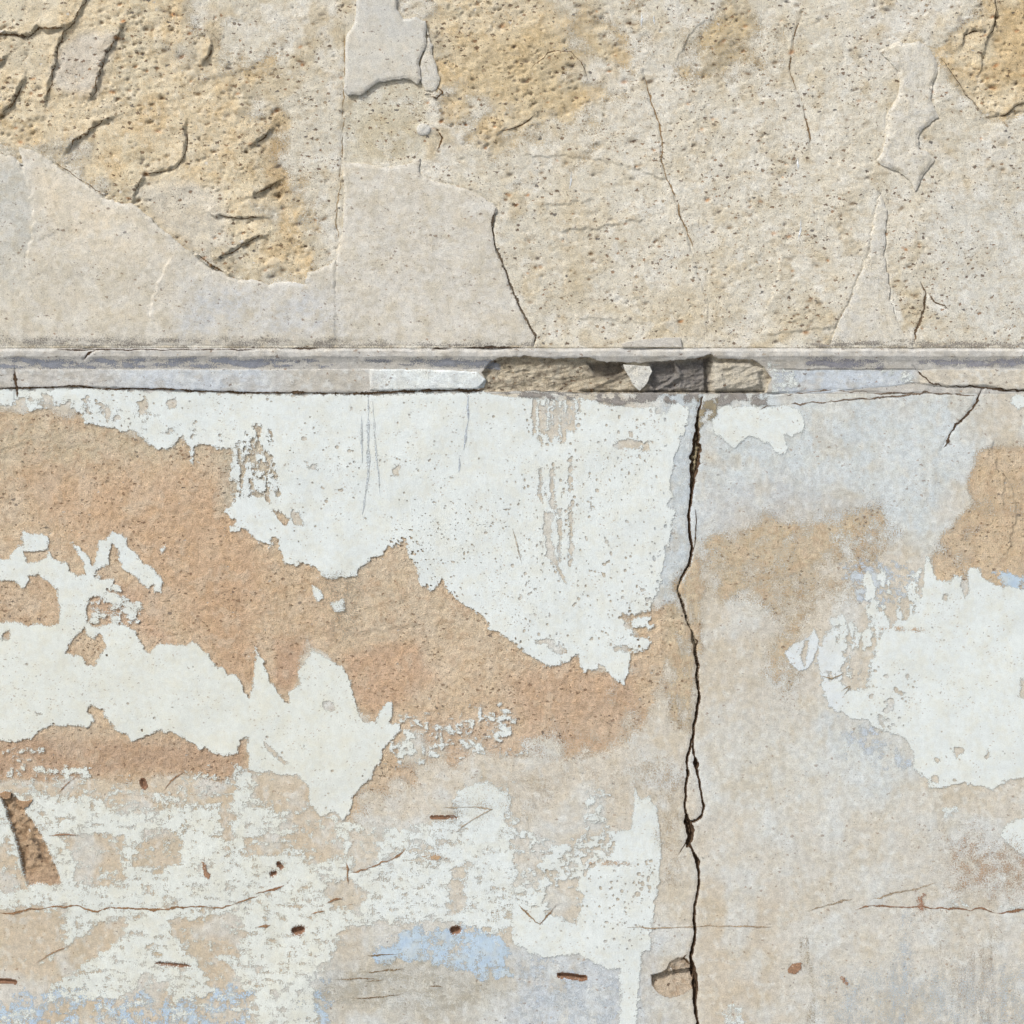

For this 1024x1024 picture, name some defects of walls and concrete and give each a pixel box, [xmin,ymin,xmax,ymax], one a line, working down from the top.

spalling [0,0,535,349]
spalling [343,0,657,176]
spalling [669,0,789,88]
spalling [877,0,1024,191]
crack [59,349,252,359]
crack [433,208,537,350]
crack [756,369,1024,448]
peeling [0,354,1024,1024]
crack [677,396,705,1024]